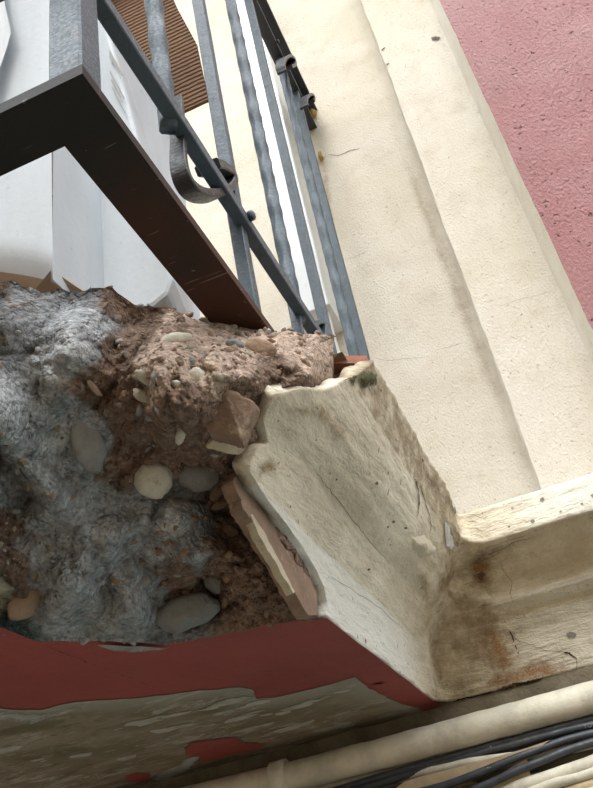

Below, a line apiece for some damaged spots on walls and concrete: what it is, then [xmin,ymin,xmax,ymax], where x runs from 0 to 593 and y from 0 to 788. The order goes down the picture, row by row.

spalling [0,281,337,652]
peeling [0,677,425,788]